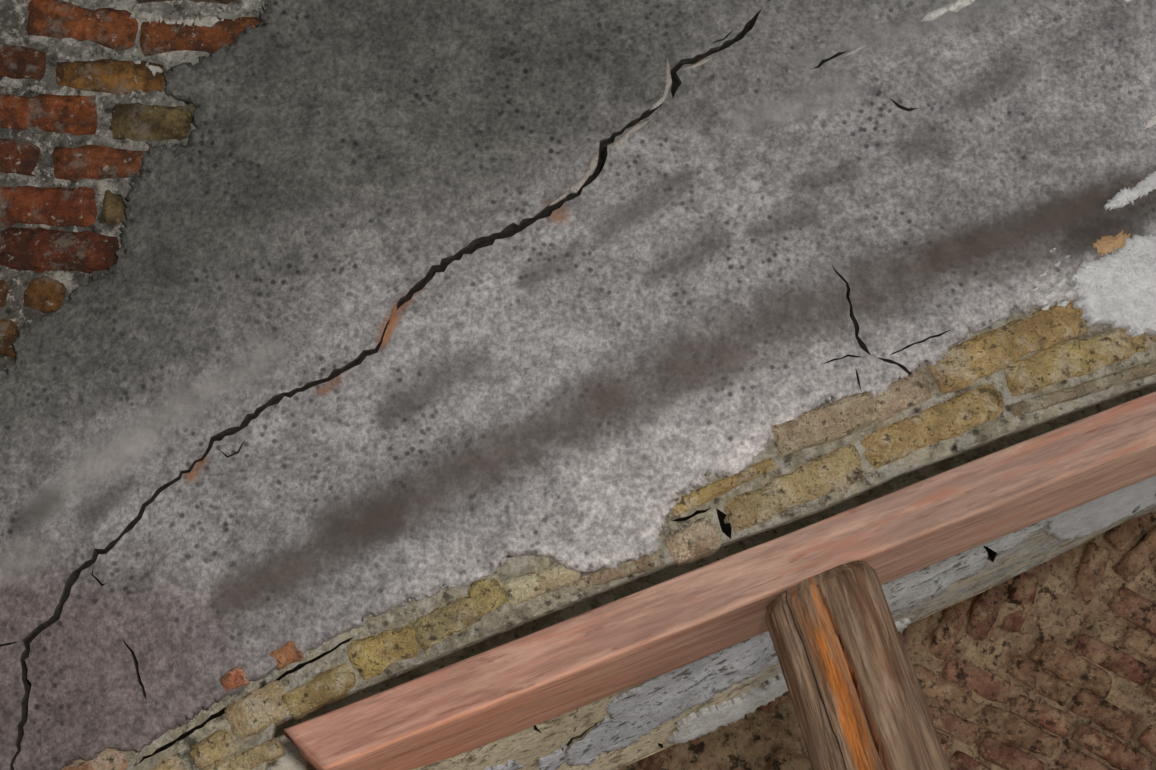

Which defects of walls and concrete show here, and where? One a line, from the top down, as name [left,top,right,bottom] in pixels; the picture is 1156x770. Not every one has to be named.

spalling [0,0,270,375]
crack [0,0,770,770]
spalling [62,229,1156,770]
crack [812,51,848,69]
crack [823,265,950,392]
peeling [1104,171,1156,211]